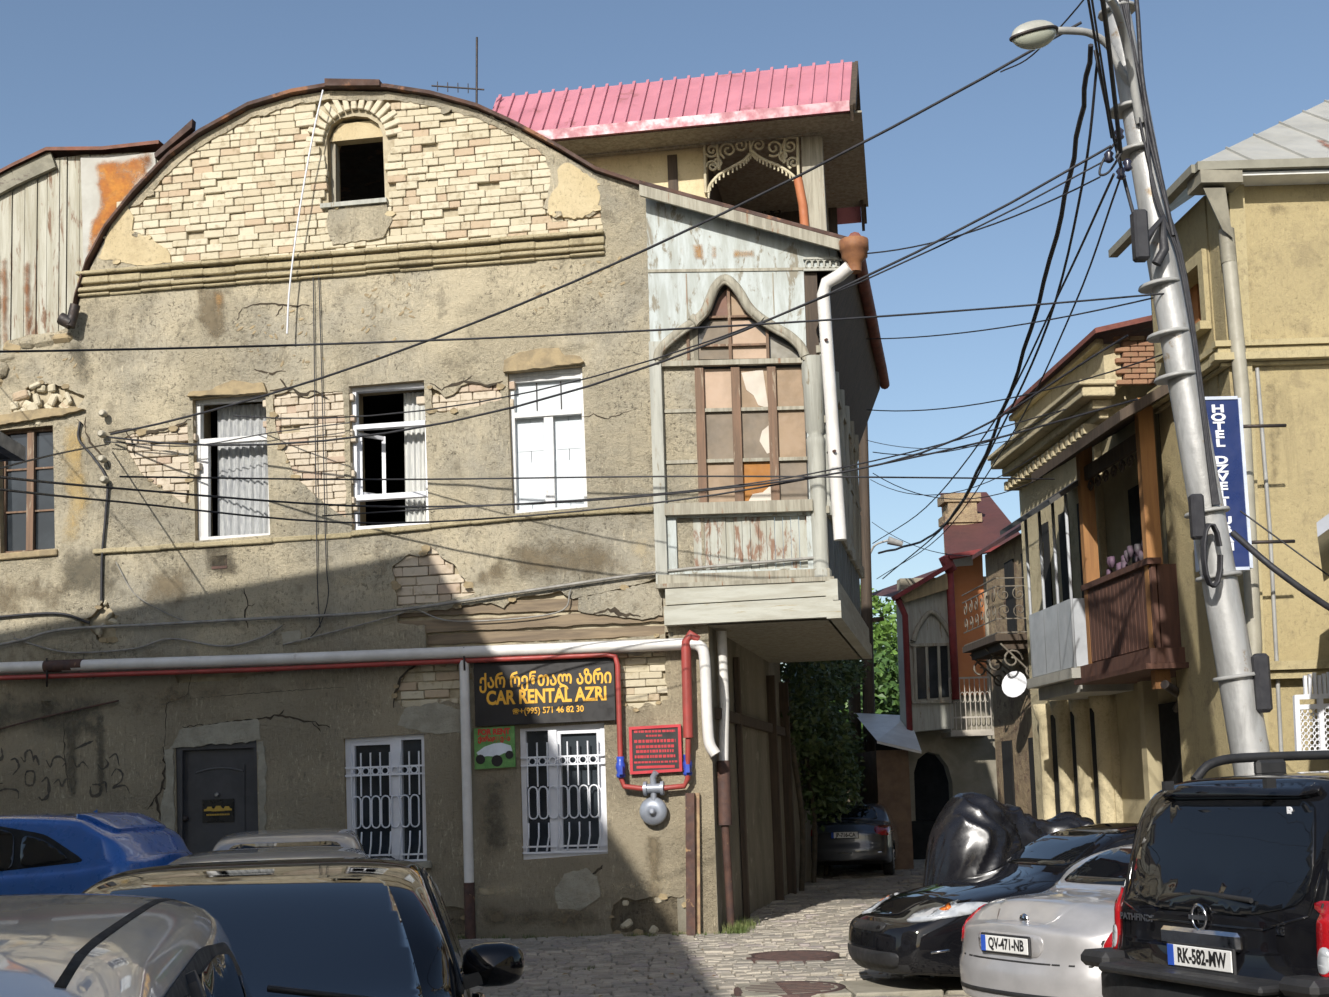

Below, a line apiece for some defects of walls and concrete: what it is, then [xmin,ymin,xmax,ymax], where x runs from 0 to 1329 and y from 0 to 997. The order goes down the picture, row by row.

corrosion [90,157,150,246]
spalling [98,94,603,266]
spalling [0,332,85,426]
spalling [187,305,359,526]
spalling [391,545,669,712]
crack [147,668,342,821]
spalling [609,893,686,935]